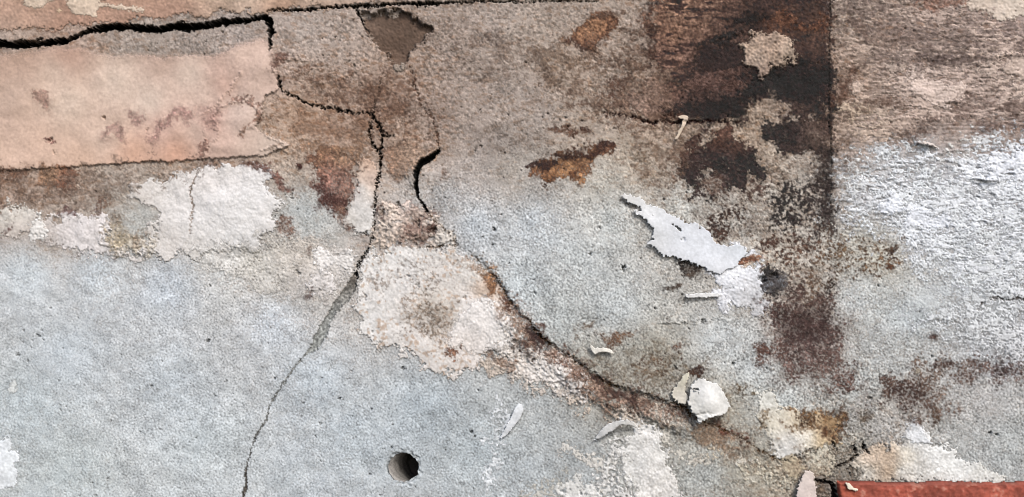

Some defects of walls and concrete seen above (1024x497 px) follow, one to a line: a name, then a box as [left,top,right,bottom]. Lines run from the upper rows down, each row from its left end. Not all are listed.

crack [0,0,594,50]
spalling [353,1,434,72]
corrosion [561,10,626,53]
crack [409,66,457,250]
corrosion [525,123,616,188]
water stain [527,0,1024,249]
peeling [817,0,1024,380]
crack [242,76,394,497]
peeling [0,156,1006,497]
water stain [663,258,706,292]
water stain [752,263,860,394]
crack [664,398,869,497]